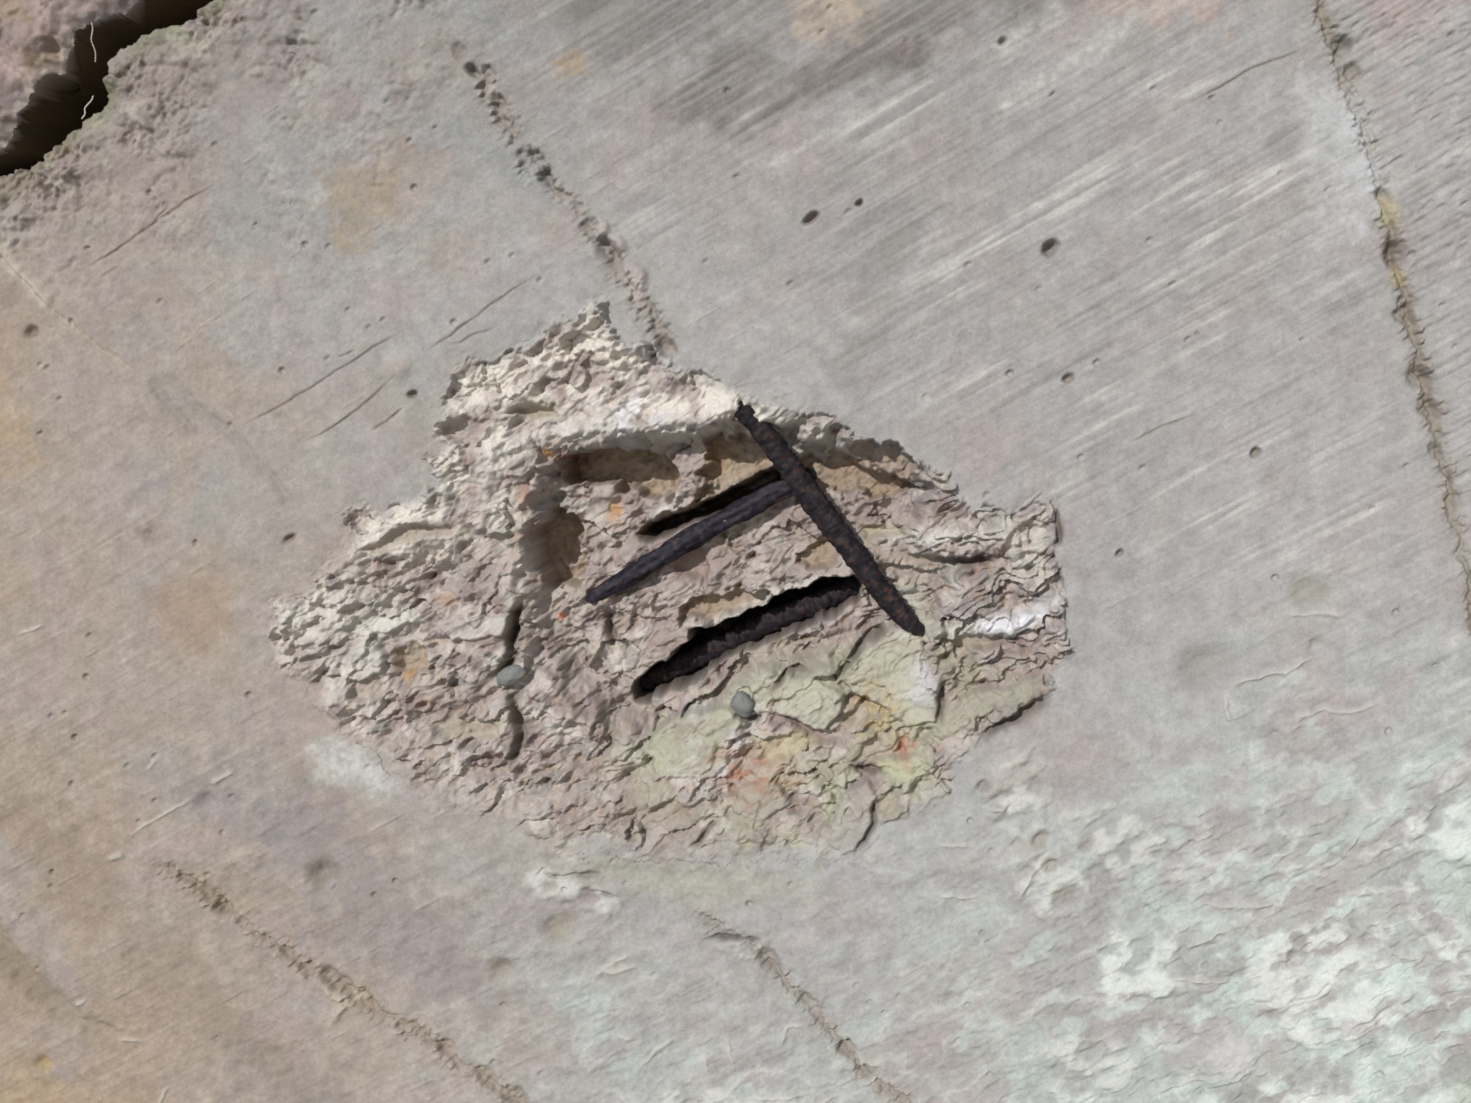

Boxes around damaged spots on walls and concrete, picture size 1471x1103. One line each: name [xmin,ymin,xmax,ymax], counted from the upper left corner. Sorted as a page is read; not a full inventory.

crack [0,0,213,177]
crack [80,183,221,276]
spalling [267,296,1222,924]
crack [699,932,761,946]
peeling [721,936,783,975]
peeling [1032,1021,1150,1092]
water stain [1432,1047,1471,1103]